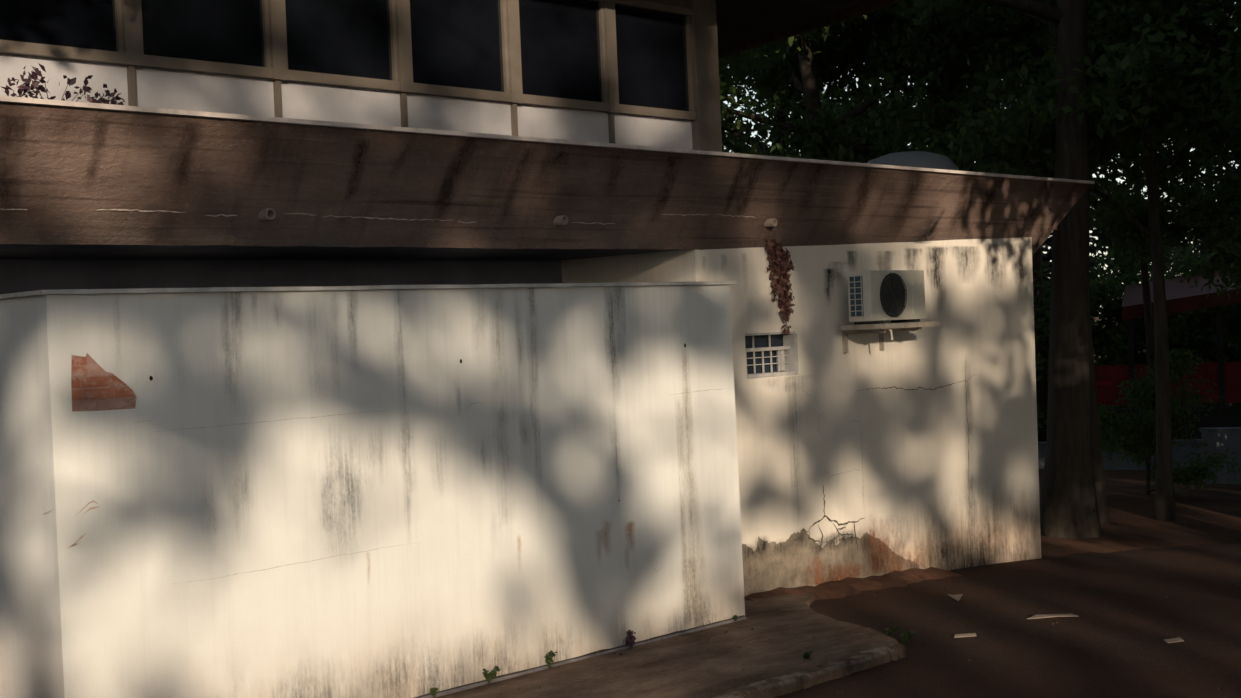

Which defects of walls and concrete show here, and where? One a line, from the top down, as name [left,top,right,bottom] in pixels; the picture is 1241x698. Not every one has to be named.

spalling [71,353,136,412]
crack [865,354,974,461]
crack [795,377,865,553]
peeling [742,522,919,597]